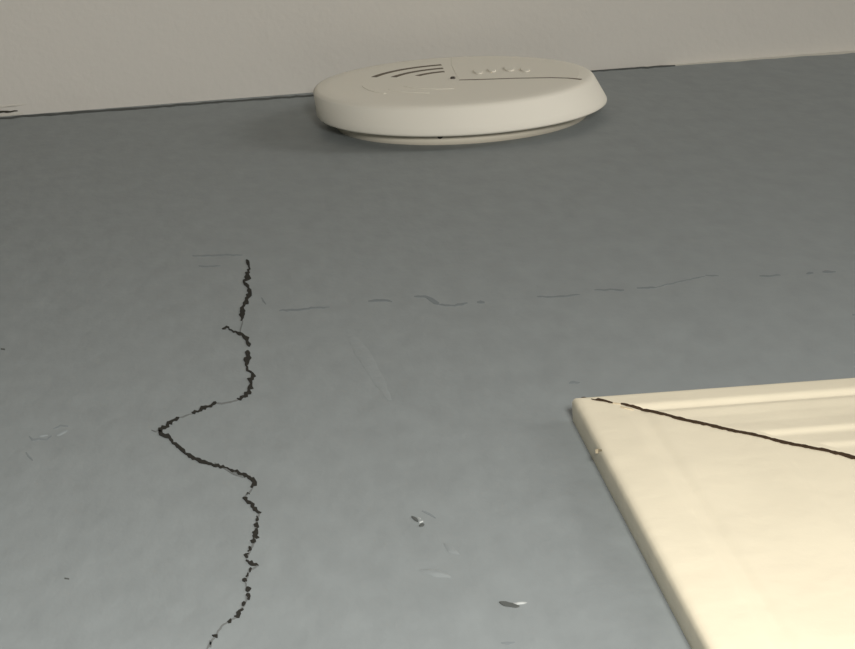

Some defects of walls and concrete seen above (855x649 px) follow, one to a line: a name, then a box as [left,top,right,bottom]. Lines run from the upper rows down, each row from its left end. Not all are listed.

crack [152,254,329,649]
crack [414,295,485,306]